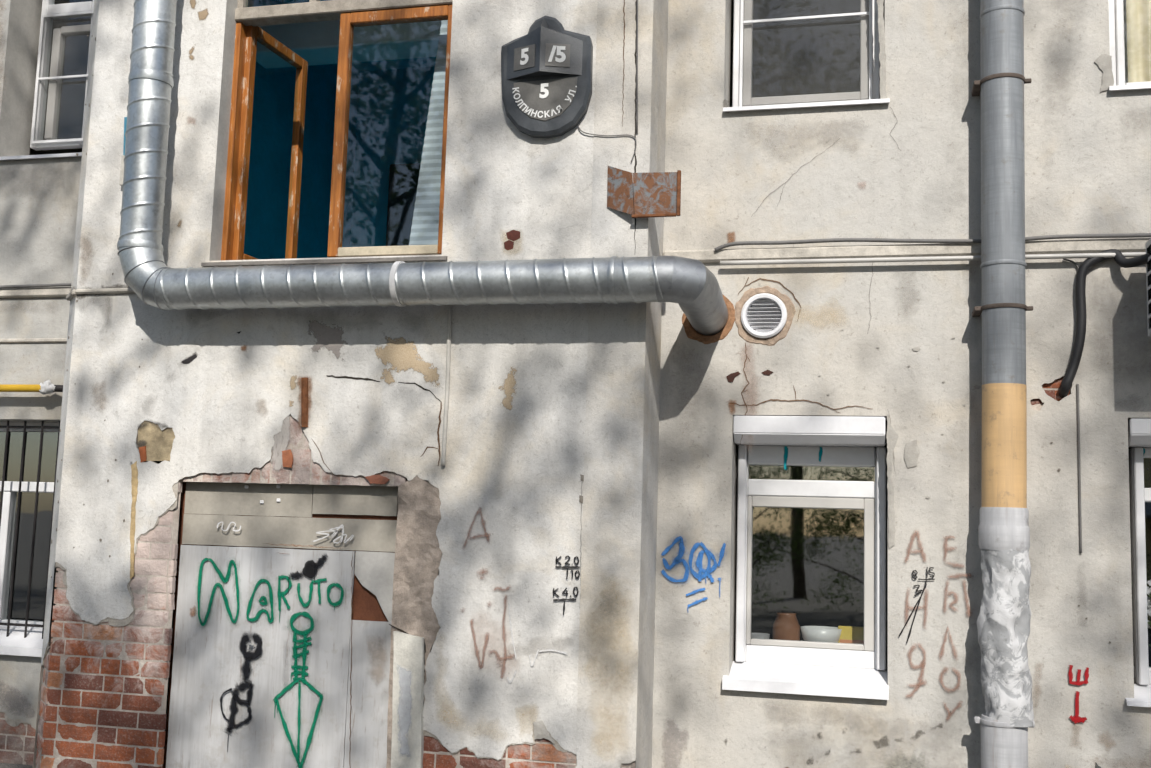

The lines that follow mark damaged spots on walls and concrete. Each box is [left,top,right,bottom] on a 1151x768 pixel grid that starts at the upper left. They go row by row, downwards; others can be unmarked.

crack [622,0,637,173]
crack [326,375,442,466]
peeling [375,337,439,385]
peeling [499,367,517,410]
crack [734,343,871,445]
spalling [0,376,442,768]
spalling [423,725,577,768]